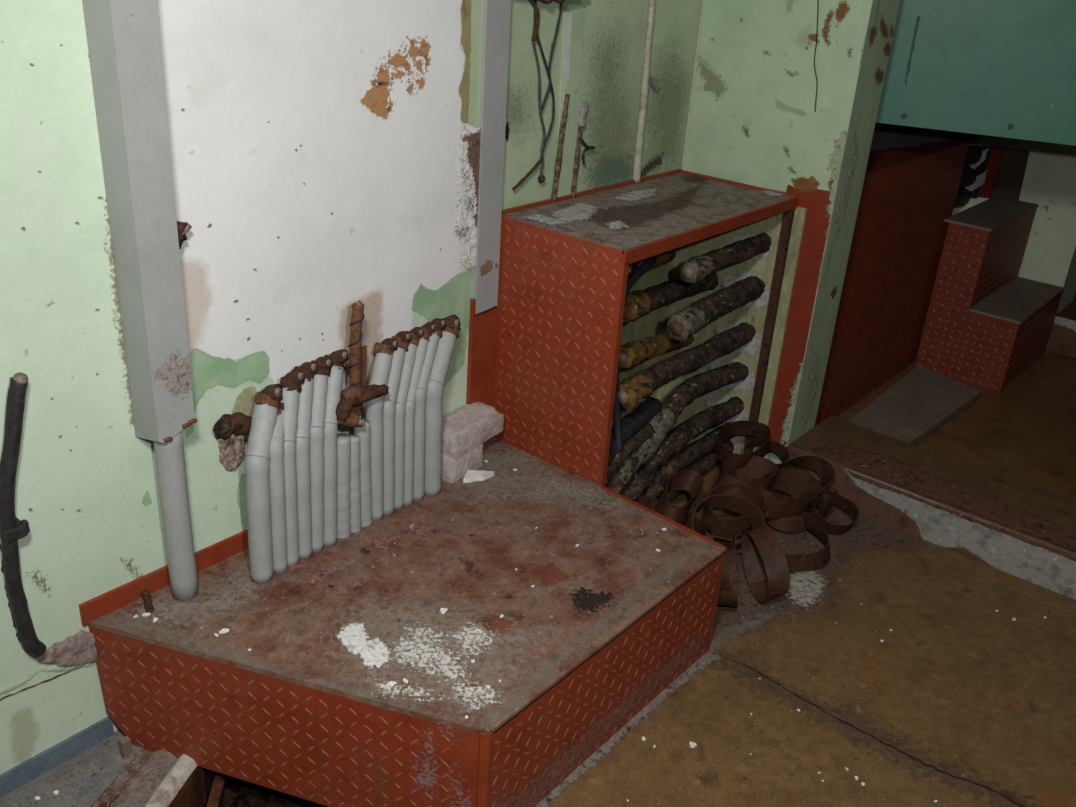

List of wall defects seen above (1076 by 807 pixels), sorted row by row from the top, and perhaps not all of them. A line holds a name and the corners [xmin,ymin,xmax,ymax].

peeling [360,35,432,122]
rust [808,1,850,46]
rust [859,15,894,84]
flaking render [412,0,483,385]
flaking render [826,131,858,239]
peeling [186,348,270,437]
spalling [780,344,1076,600]
crack [713,654,1027,807]